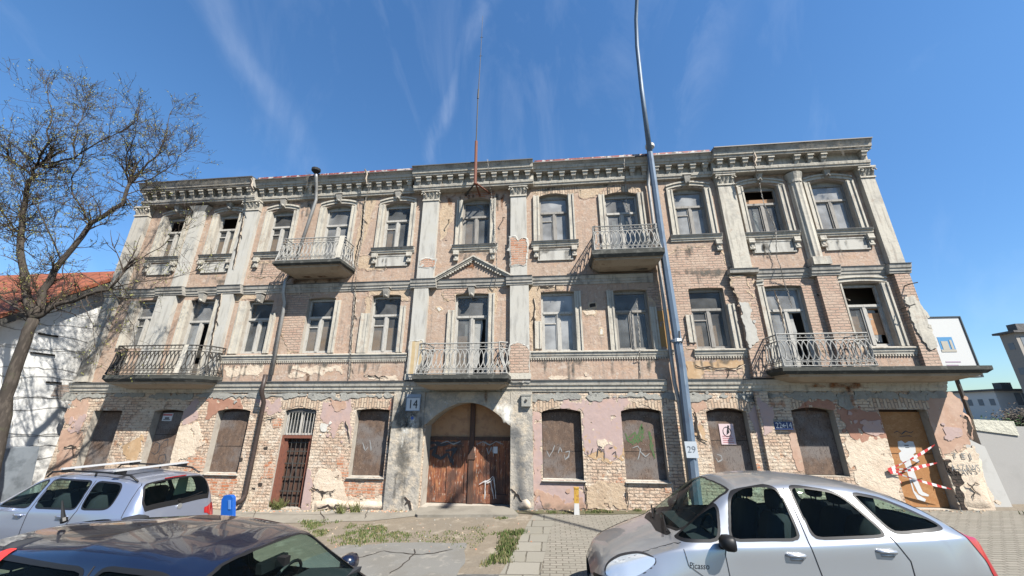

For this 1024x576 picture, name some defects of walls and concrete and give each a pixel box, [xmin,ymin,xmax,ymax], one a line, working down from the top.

flaking render [507,235,529,267]
peeling [51,339,424,498]
peeling [301,453,386,510]
flaking render [507,246,1001,510]